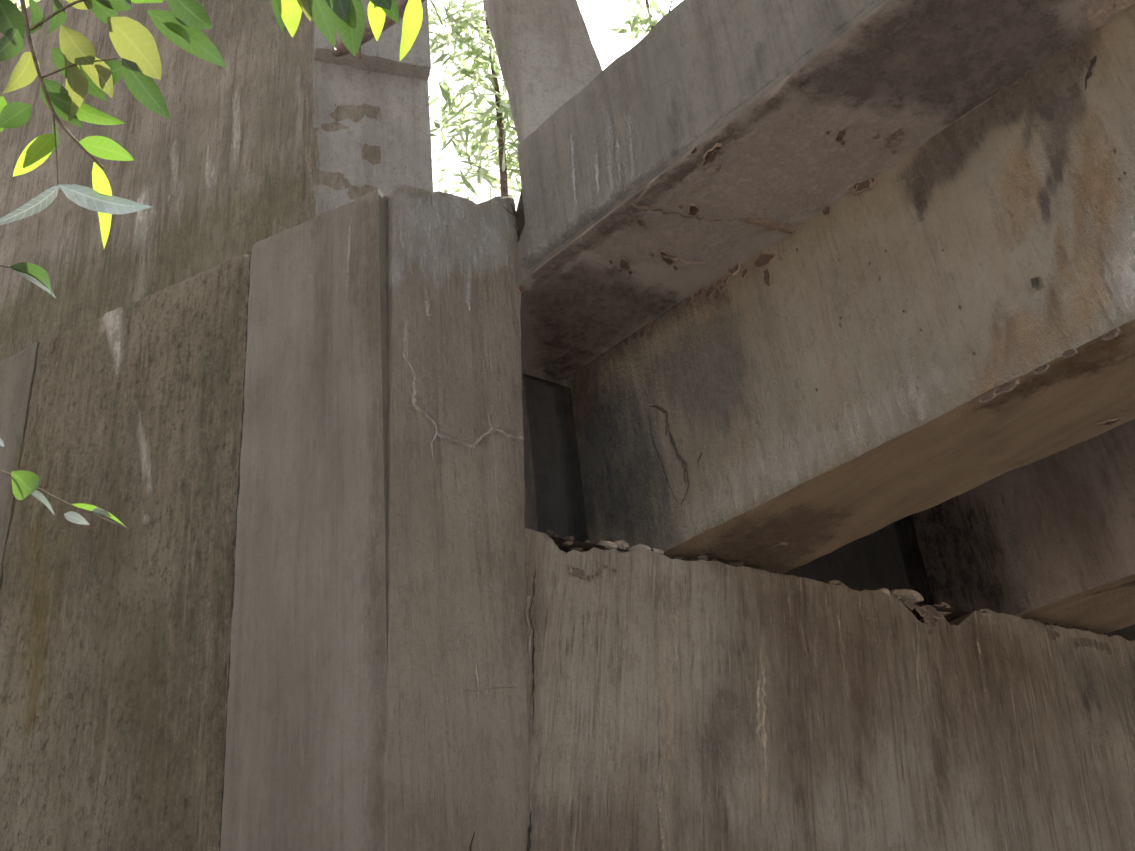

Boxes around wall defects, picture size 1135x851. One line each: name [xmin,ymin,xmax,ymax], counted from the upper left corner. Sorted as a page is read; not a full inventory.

leakage [522,0,1097,542]
crack [402,352,524,461]
crack [649,405,702,514]